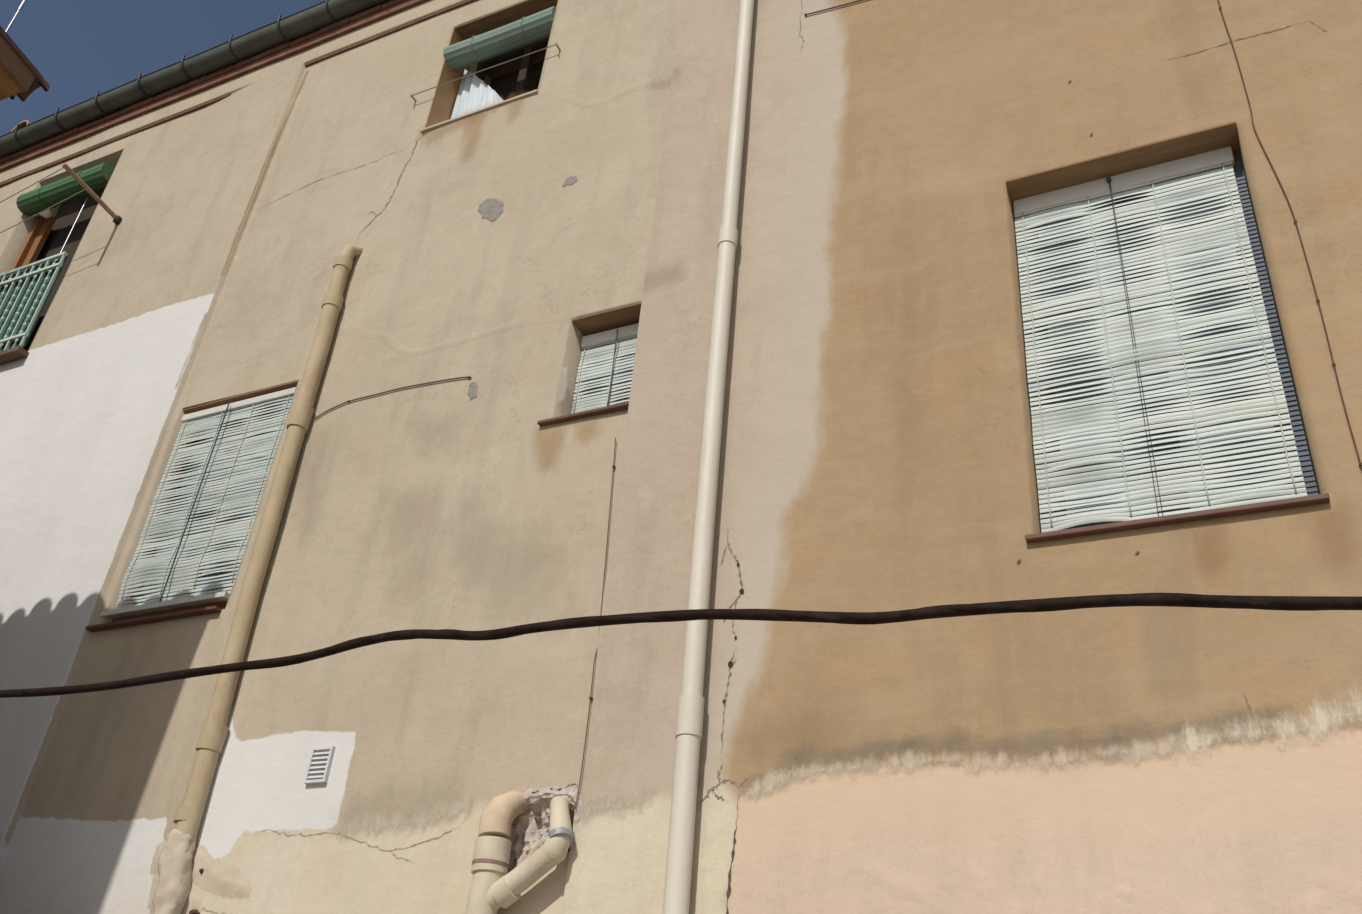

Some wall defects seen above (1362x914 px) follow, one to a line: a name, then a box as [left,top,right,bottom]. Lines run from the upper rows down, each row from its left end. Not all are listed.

crack [261,132,428,232]
spalling [477,198,504,222]
spalling [562,175,578,187]
crack [700,527,747,914]